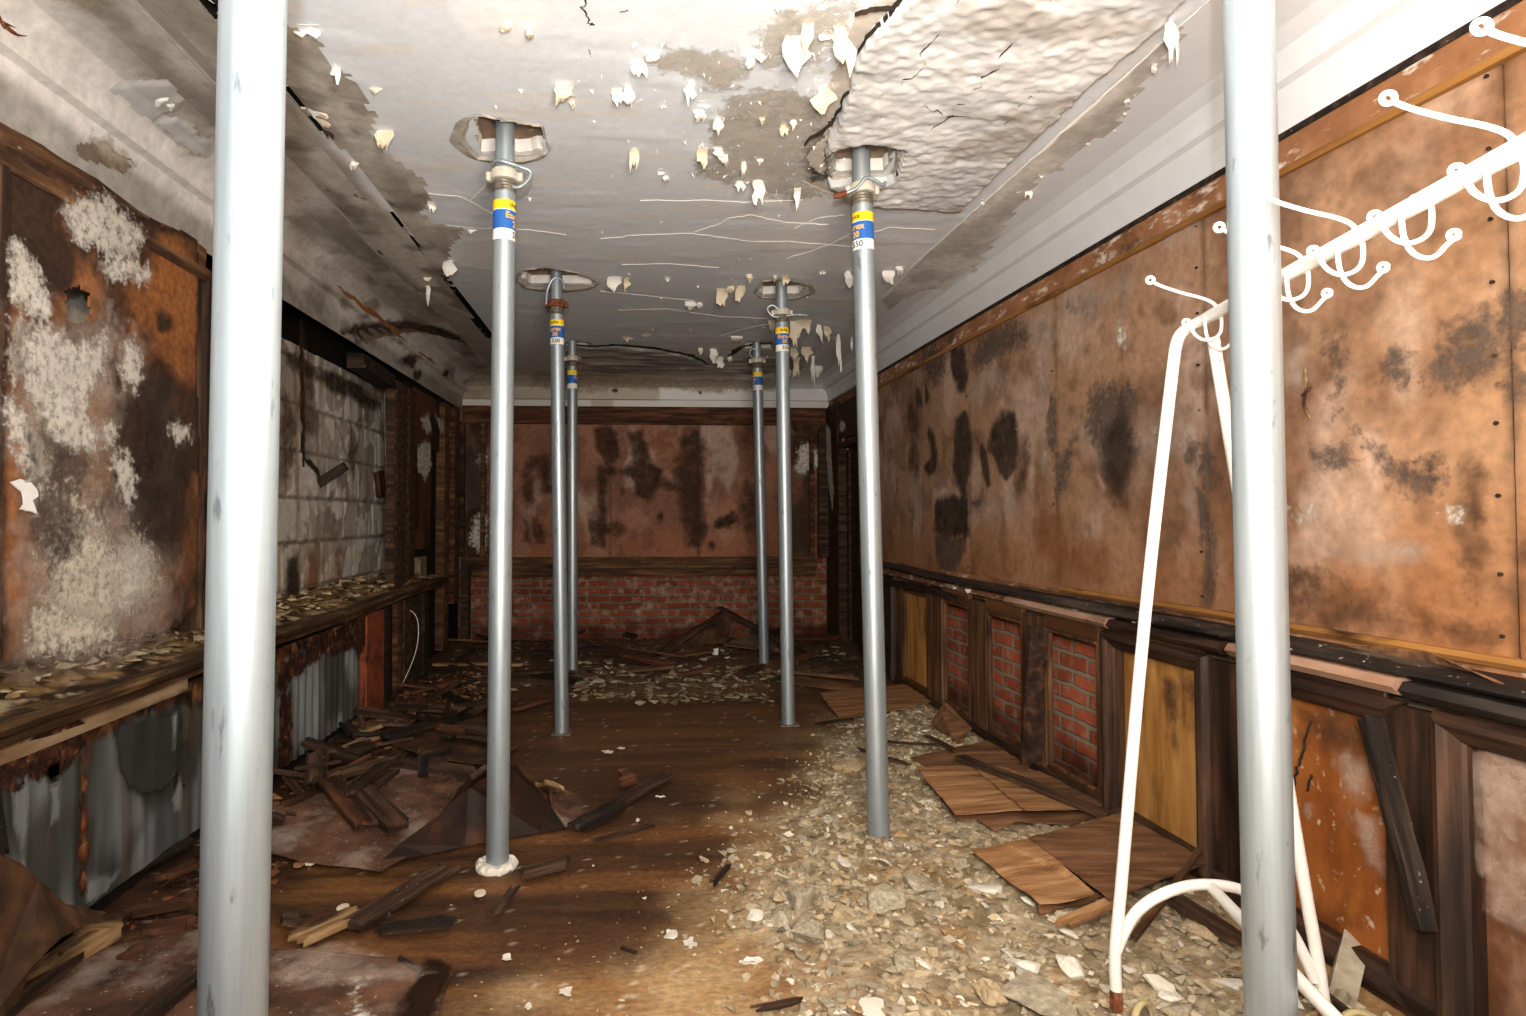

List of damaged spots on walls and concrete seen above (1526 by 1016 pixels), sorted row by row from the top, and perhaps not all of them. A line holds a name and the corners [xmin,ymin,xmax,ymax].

rust [0,16,27,36]
water stain [61,191,151,287]
peeling [285,24,476,318]
crack [580,0,628,57]
peeling [683,80,766,205]
peeling [745,0,897,180]
peeling [882,21,1188,310]
peeling [698,320,853,390]
mould [2,241,190,661]
water stain [589,426,756,548]
water stain [909,315,1156,578]
rust [0,719,90,896]